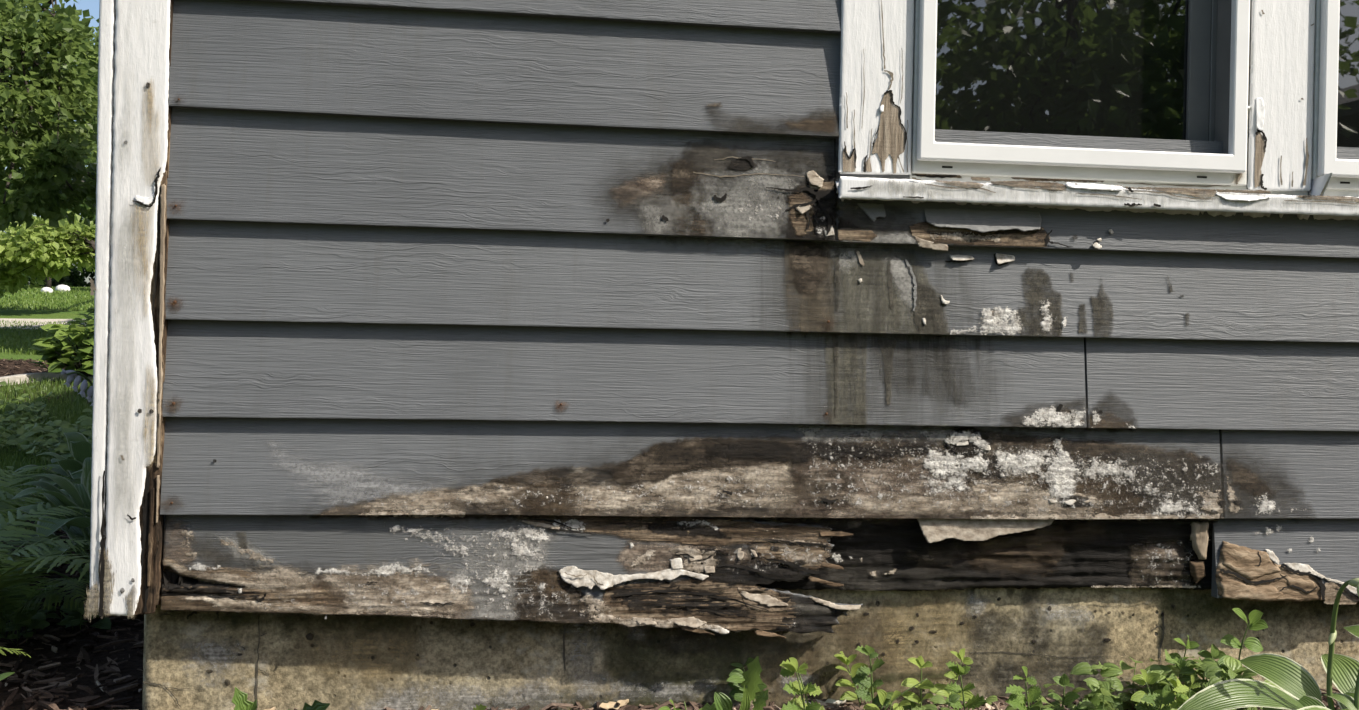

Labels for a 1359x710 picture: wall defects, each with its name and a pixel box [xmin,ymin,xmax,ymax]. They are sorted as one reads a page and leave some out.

water stain [732,110,837,136]
peeling [842,90,907,222]
peeling [903,97,1359,266]
water stain [313,144,1306,660]
peeling [944,428,995,456]
peeling [917,495,1094,543]
spalling [304,563,475,627]
peeling [559,541,719,590]
peeling [1256,525,1359,605]
water stain [312,625,415,678]
water stain [630,589,1108,708]
water stain [365,681,559,710]